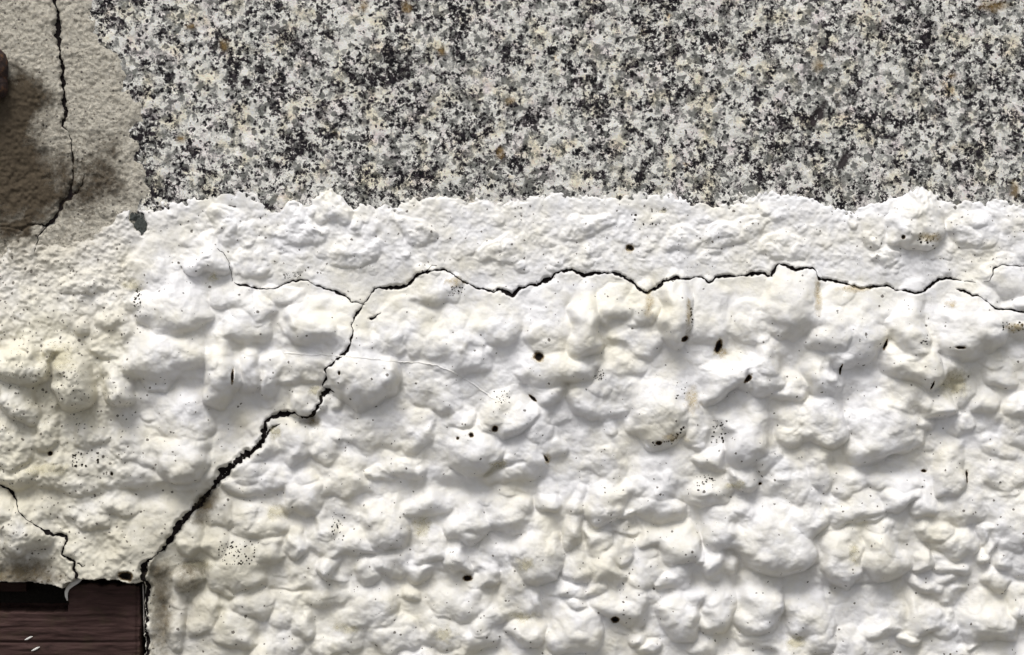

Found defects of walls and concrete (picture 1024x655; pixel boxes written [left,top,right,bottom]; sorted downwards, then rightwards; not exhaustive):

crack [0,0,85,251]
crack [0,485,85,579]
peeling [65,579,82,601]
crack [140,248,1024,655]